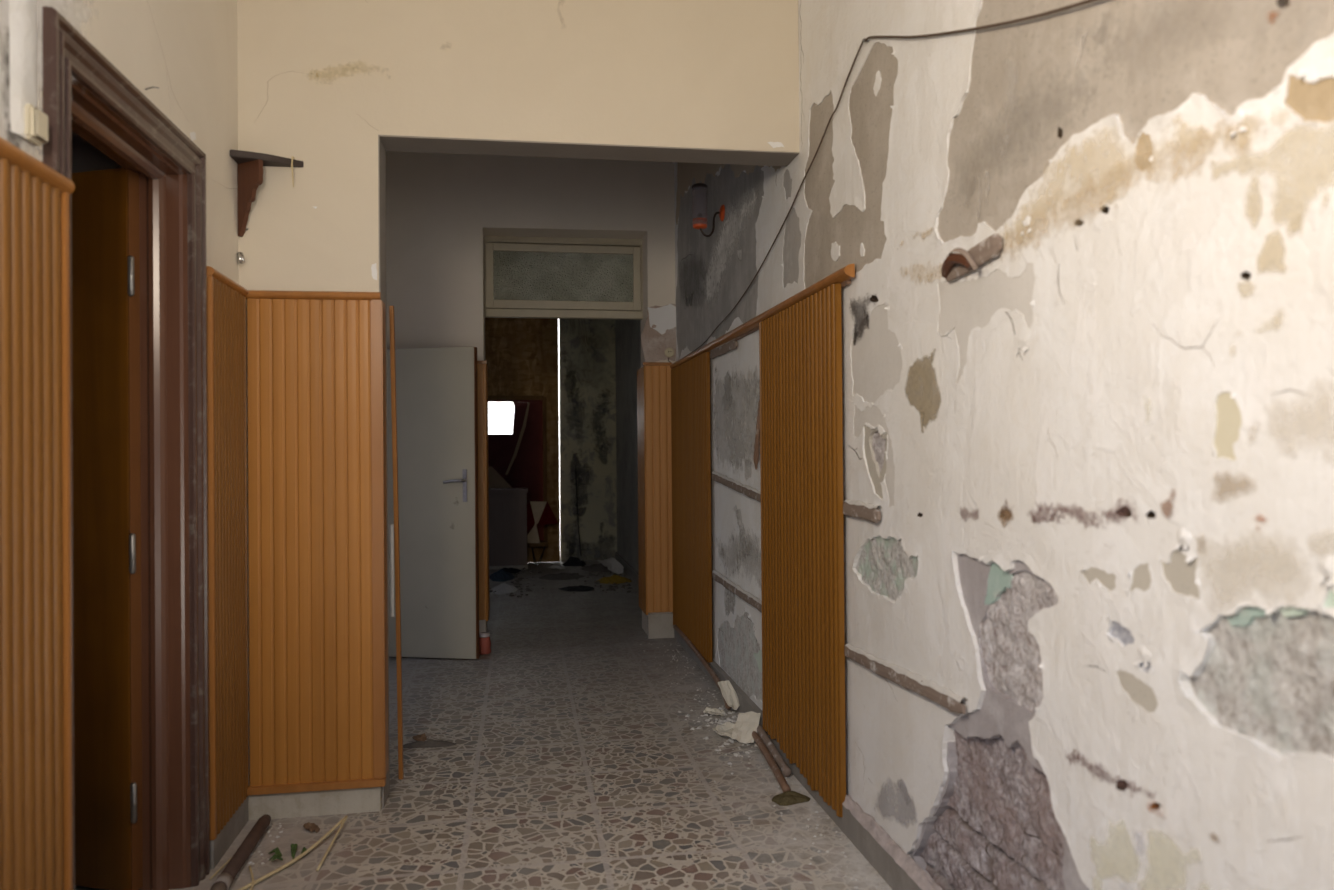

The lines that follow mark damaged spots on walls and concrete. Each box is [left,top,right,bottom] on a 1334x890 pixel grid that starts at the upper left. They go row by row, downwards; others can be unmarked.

damp [684,190,759,303]
peeling [641,42,898,362]
peeling [937,0,1334,242]
damp [566,371,614,561]
peeling [851,304,902,507]
peeling [1211,392,1242,460]
spalling [853,536,919,601]
spalling [910,553,1090,890]
spalling [1178,580,1334,759]